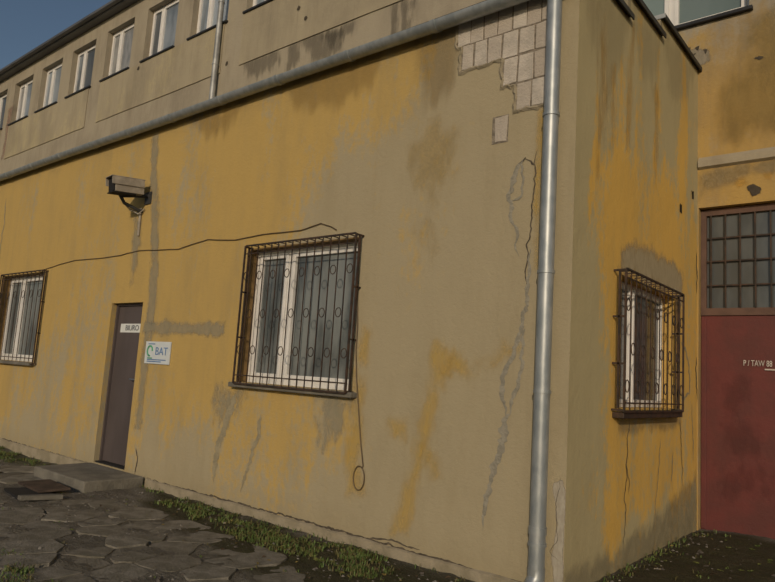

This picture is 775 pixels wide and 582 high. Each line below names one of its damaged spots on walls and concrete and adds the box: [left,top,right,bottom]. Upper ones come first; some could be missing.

spalling [454,0,547,145]
spalling [689,46,710,65]
spalling [747,184,761,196]
crack [482,152,537,530]
crack [134,394,472,569]
crack [622,423,630,542]